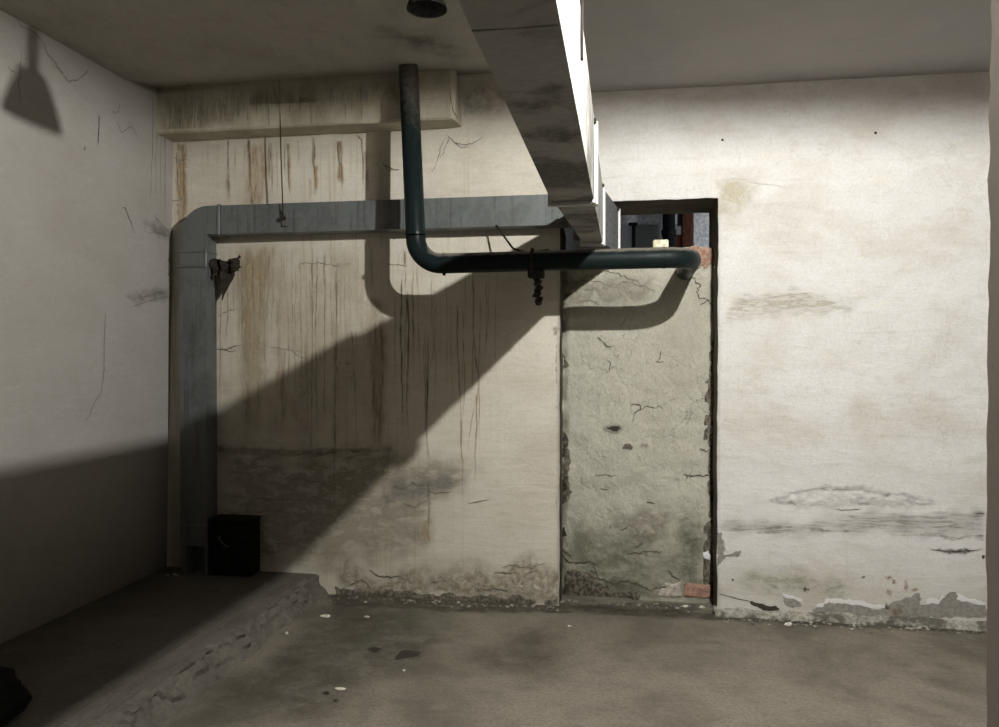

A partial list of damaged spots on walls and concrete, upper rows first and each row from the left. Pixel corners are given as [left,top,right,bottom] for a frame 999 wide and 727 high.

crack [432,94,480,171]
rust [172,144,186,220]
water stain [218,261,458,559]
spalling [562,431,572,504]
flaking render [335,562,641,606]
crack [563,543,678,591]
peeling [782,592,987,618]